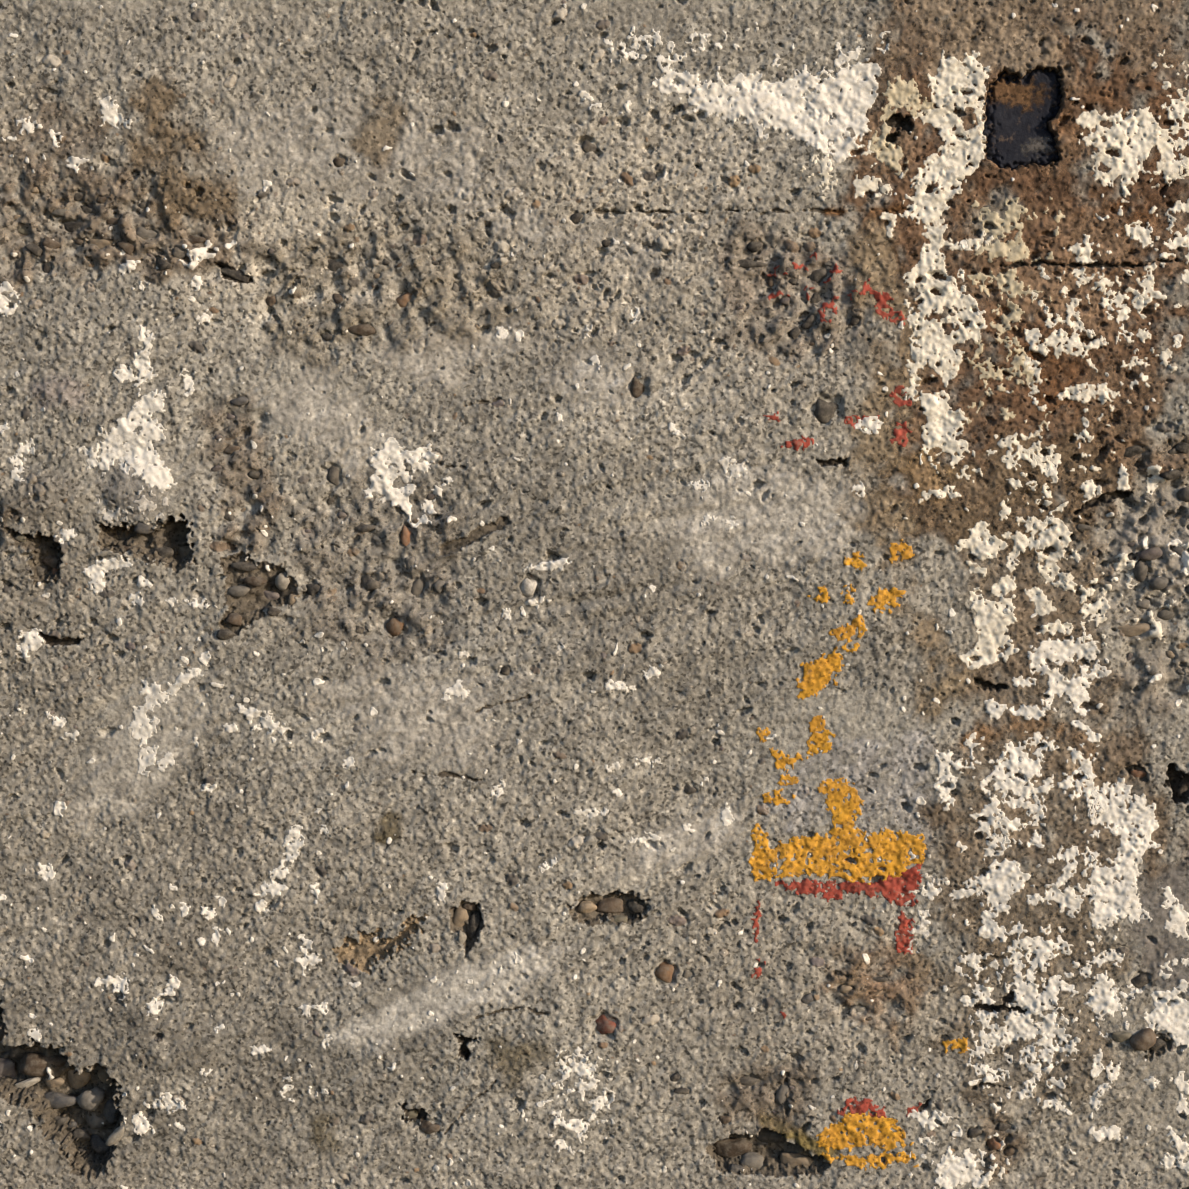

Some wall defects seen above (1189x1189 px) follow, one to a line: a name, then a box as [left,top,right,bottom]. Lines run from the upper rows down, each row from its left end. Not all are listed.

crack [1000,258,1178,269]
peeling [16,628,84,658]
peeling [77,325,199,606]
peeling [165,396,461,661]
peeling [602,29,1189,1189]
corrosion [824,0,1189,1105]
peeling [127,651,211,778]
peeling [223,703,292,735]
peeling [252,824,305,913]
spalling [332,881,484,988]
spalling [566,890,650,927]
spalling [0,1000,187,1181]